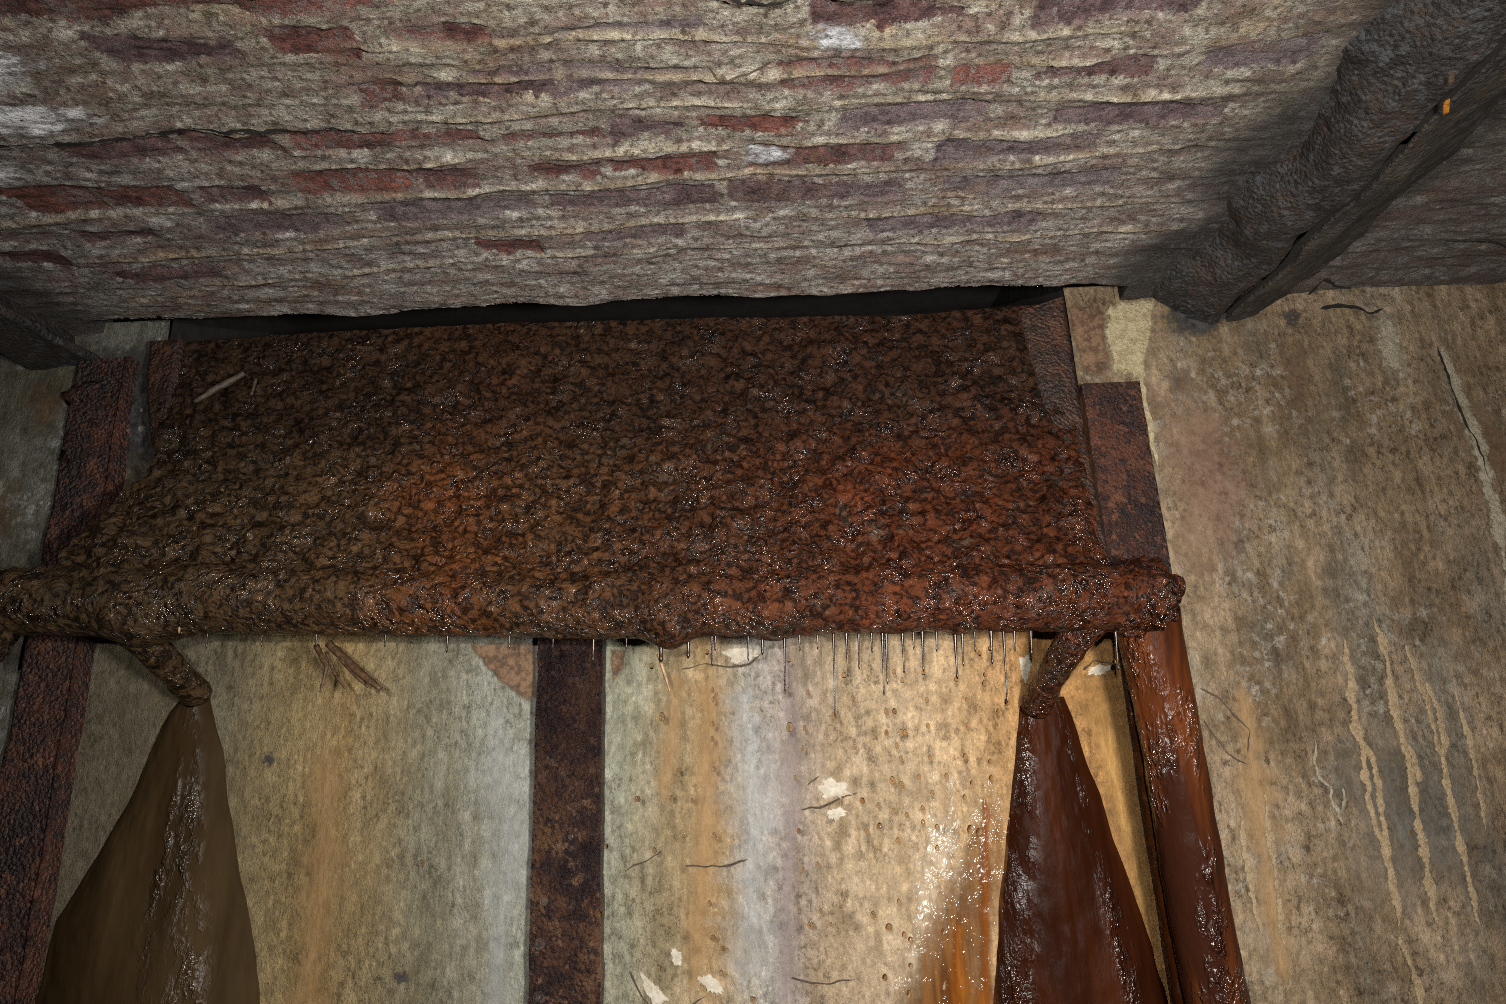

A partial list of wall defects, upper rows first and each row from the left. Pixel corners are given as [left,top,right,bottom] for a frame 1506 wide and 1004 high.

crack [731,0,789,8]
crack [1438,349,1488,476]
leakage [897,801,1001,1004]
corrosion [993,696,1168,1004]
leakage [1313,740,1346,826]
leakage [1342,617,1486,1004]